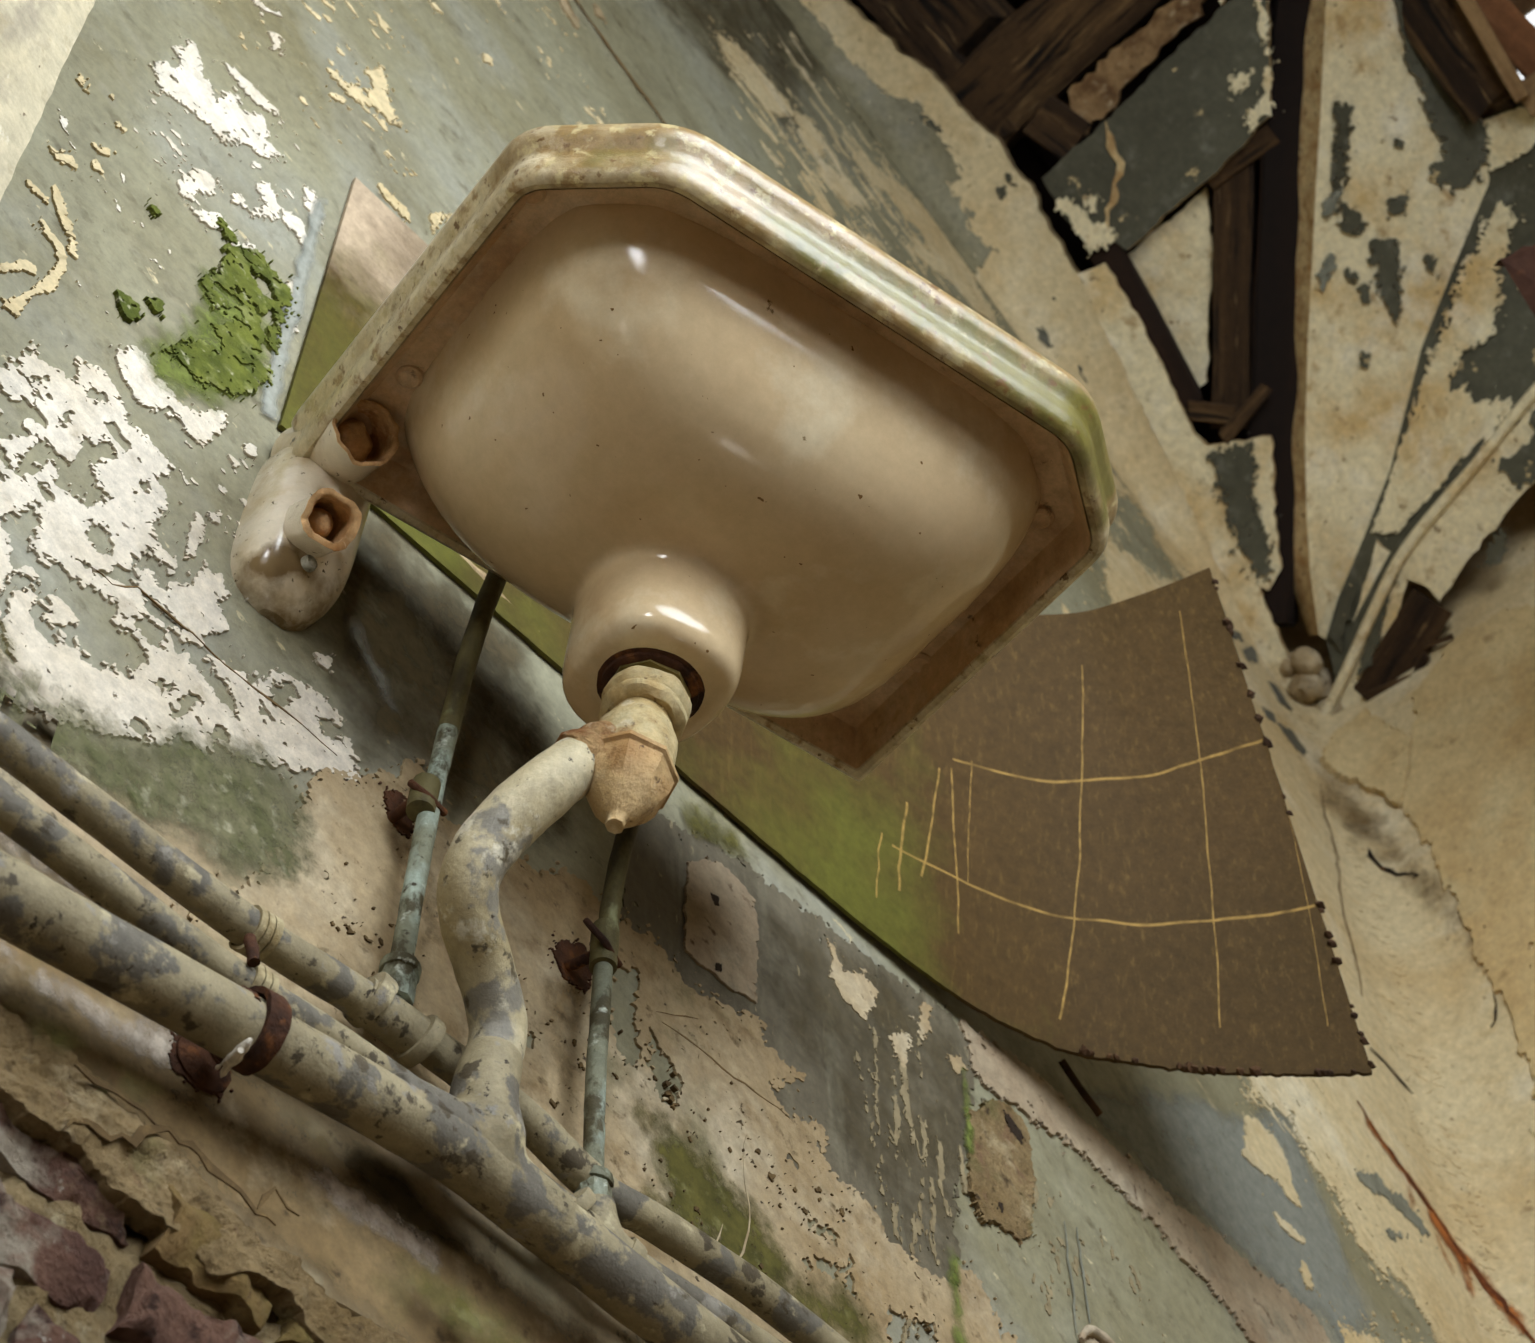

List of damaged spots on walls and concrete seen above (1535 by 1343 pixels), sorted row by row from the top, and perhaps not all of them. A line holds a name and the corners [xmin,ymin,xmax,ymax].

peeling [134,34,330,255]
peeling [320,57,409,133]
crack [567,0,667,124]
peeling [708,16,1003,329]
peeling [1054,189,1119,258]
peeling [1199,0,1535,652]
peeling [170,903,451,1093]
peeling [499,854,603,1147]
peeling [604,611,1526,1343]
flaking render [0,1004,408,1343]
rust [1367,1121,1522,1328]
crack [1357,1100,1535,1343]